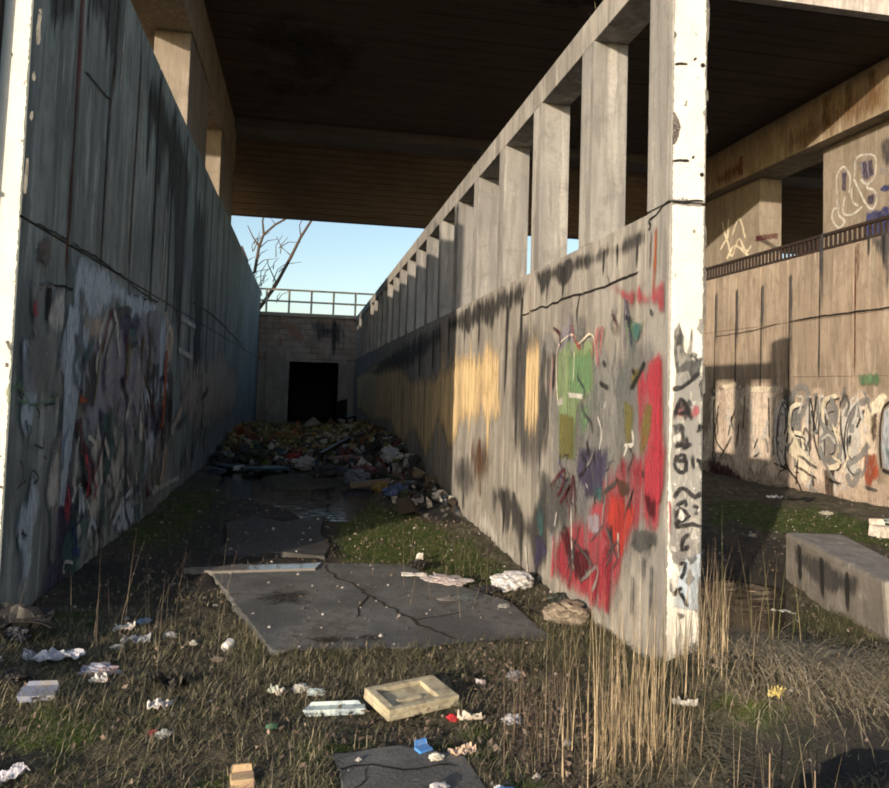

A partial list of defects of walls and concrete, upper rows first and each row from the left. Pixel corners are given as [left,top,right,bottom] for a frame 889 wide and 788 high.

corrosion [65,0,85,264]
crack [523,272,638,322]
water stain [537,232,641,298]
water stain [316,321,345,355]
crack [324,565,462,639]
crack [335,764,457,788]